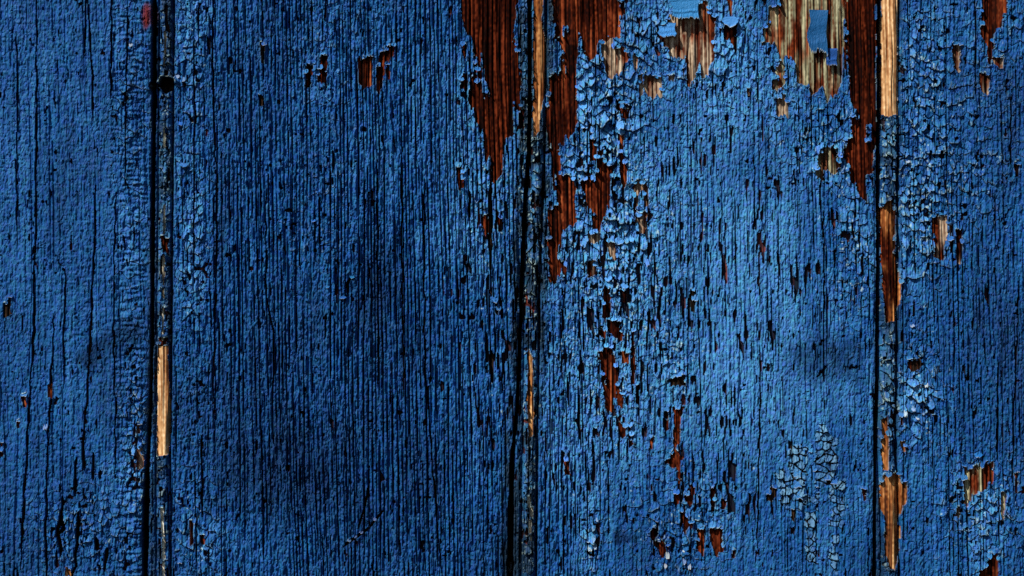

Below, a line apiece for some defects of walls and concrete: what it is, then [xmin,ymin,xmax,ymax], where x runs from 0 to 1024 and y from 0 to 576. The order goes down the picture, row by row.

peeling [304,52,328,89]
peeling [358,41,396,95]
peeling [458,0,525,184]
peeling [761,0,895,211]
peeling [952,41,964,73]
peeling [979,0,1007,95]
peeling [455,162,466,191]
peeling [545,0,738,448]
peeling [649,404,735,570]
crack [756,385,845,566]
peeling [879,408,925,452]
peeling [955,452,1024,521]